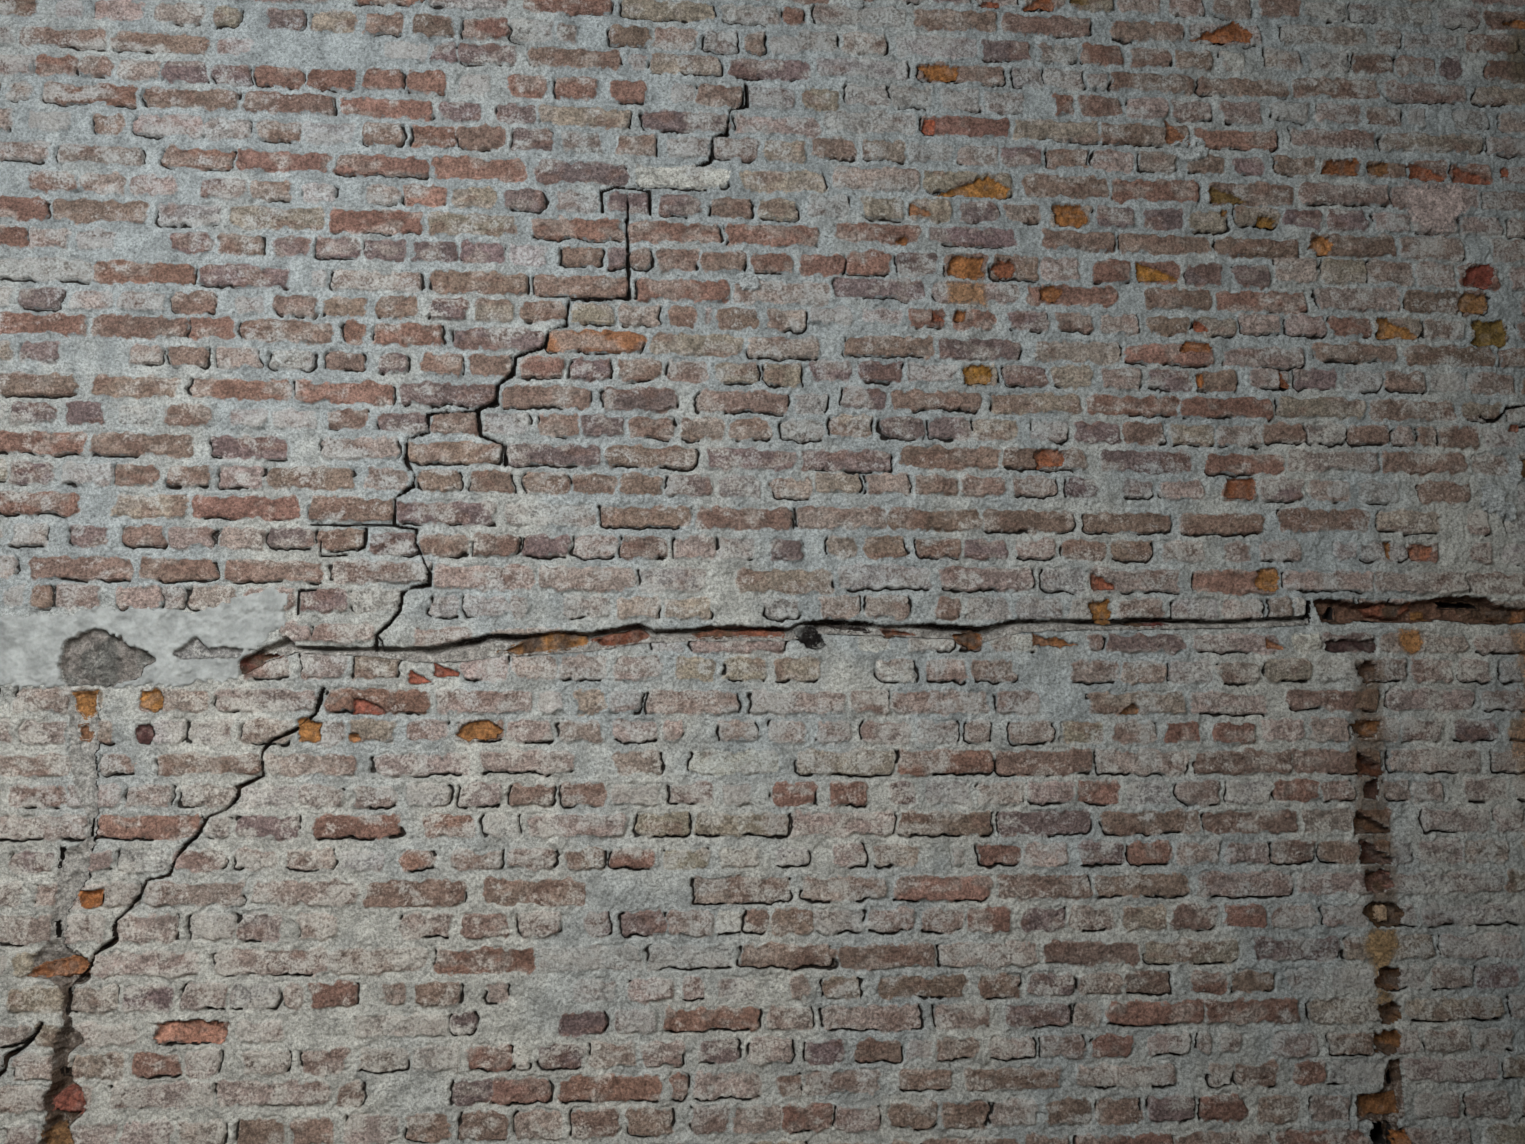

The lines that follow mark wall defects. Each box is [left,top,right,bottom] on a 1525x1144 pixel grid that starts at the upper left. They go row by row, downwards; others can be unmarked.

crack [297,85,749,652]
crack [1479,405,1525,428]
spalling [60,629,164,744]
spalling [173,638,284,674]
crack [0,687,326,1076]